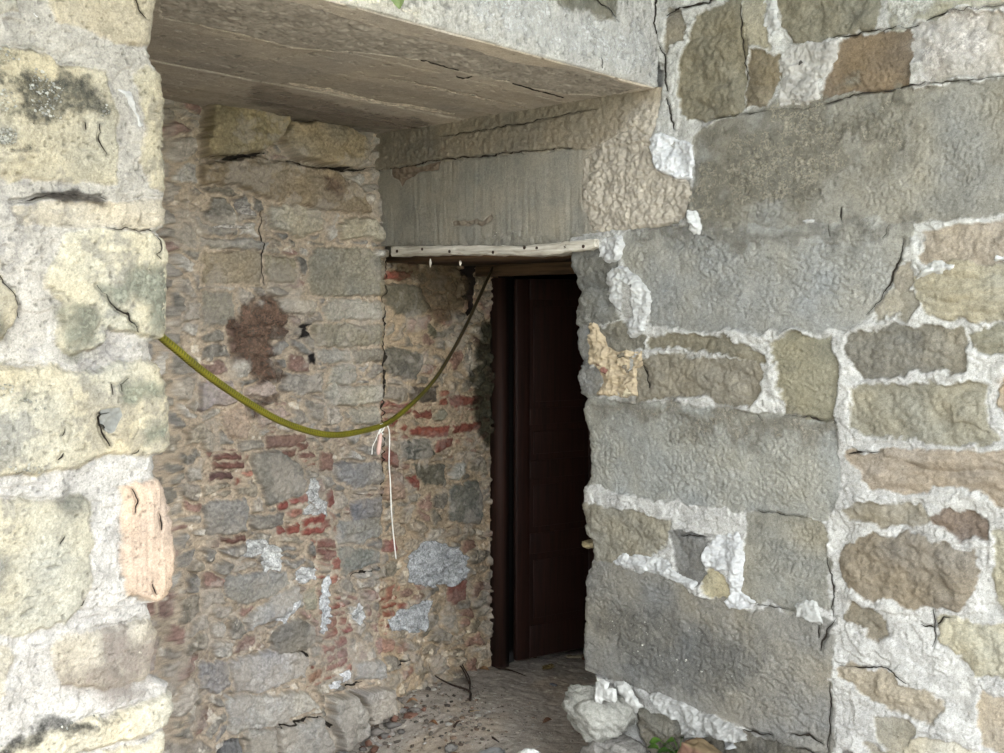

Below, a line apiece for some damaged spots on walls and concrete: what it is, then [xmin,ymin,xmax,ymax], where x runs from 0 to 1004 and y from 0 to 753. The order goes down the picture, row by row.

crack [421,60,472,79]
crack [653,0,712,129]
crack [740,8,748,80]
water stain [38,189,104,204]
crack [97,285,138,332]
peeling [587,322,643,398]